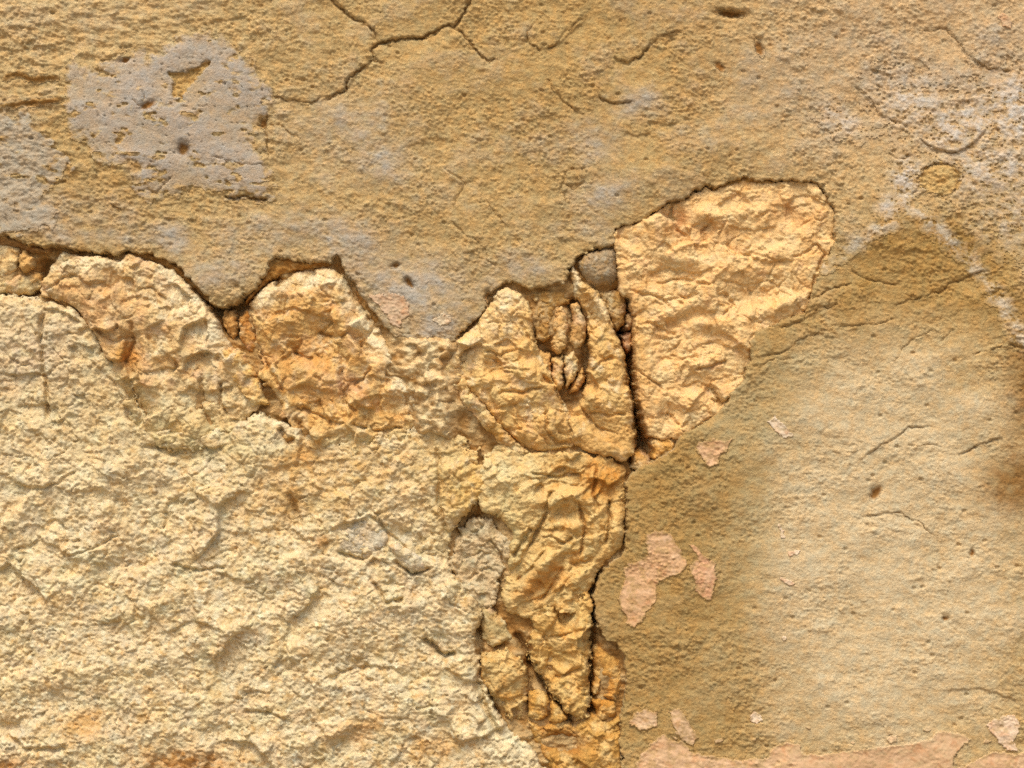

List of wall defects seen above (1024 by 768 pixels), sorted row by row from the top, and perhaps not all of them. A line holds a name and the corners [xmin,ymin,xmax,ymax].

crack [527,18,587,50]
crack [620,30,686,62]
spalling [710,178,772,191]
spalling [129,251,213,306]
spalling [245,258,332,306]
spalling [356,290,389,331]
peeling [689,544,717,601]
peeling [668,708,699,746]